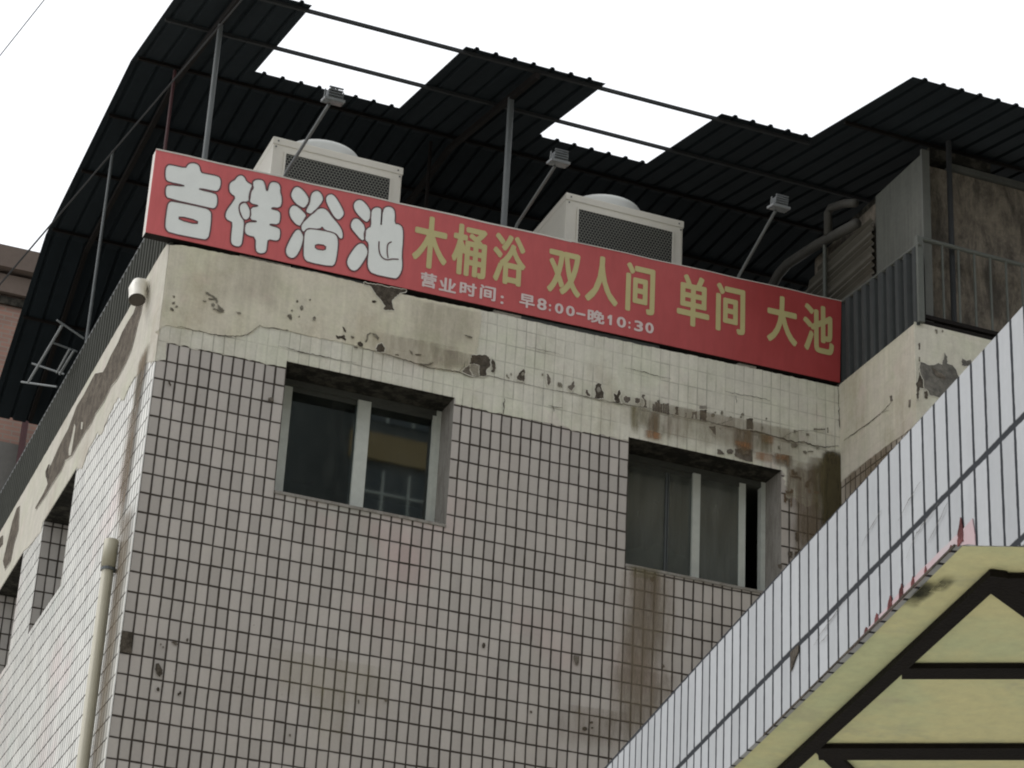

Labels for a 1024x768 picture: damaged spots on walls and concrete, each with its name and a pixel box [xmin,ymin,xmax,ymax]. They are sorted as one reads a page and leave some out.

spalling [35,305,143,510]
spalling [336,327,433,366]
spalling [462,354,526,382]
crack [179,325,889,448]
spalling [542,373,767,436]
spalling [908,343,972,407]
spalling [0,505,20,570]